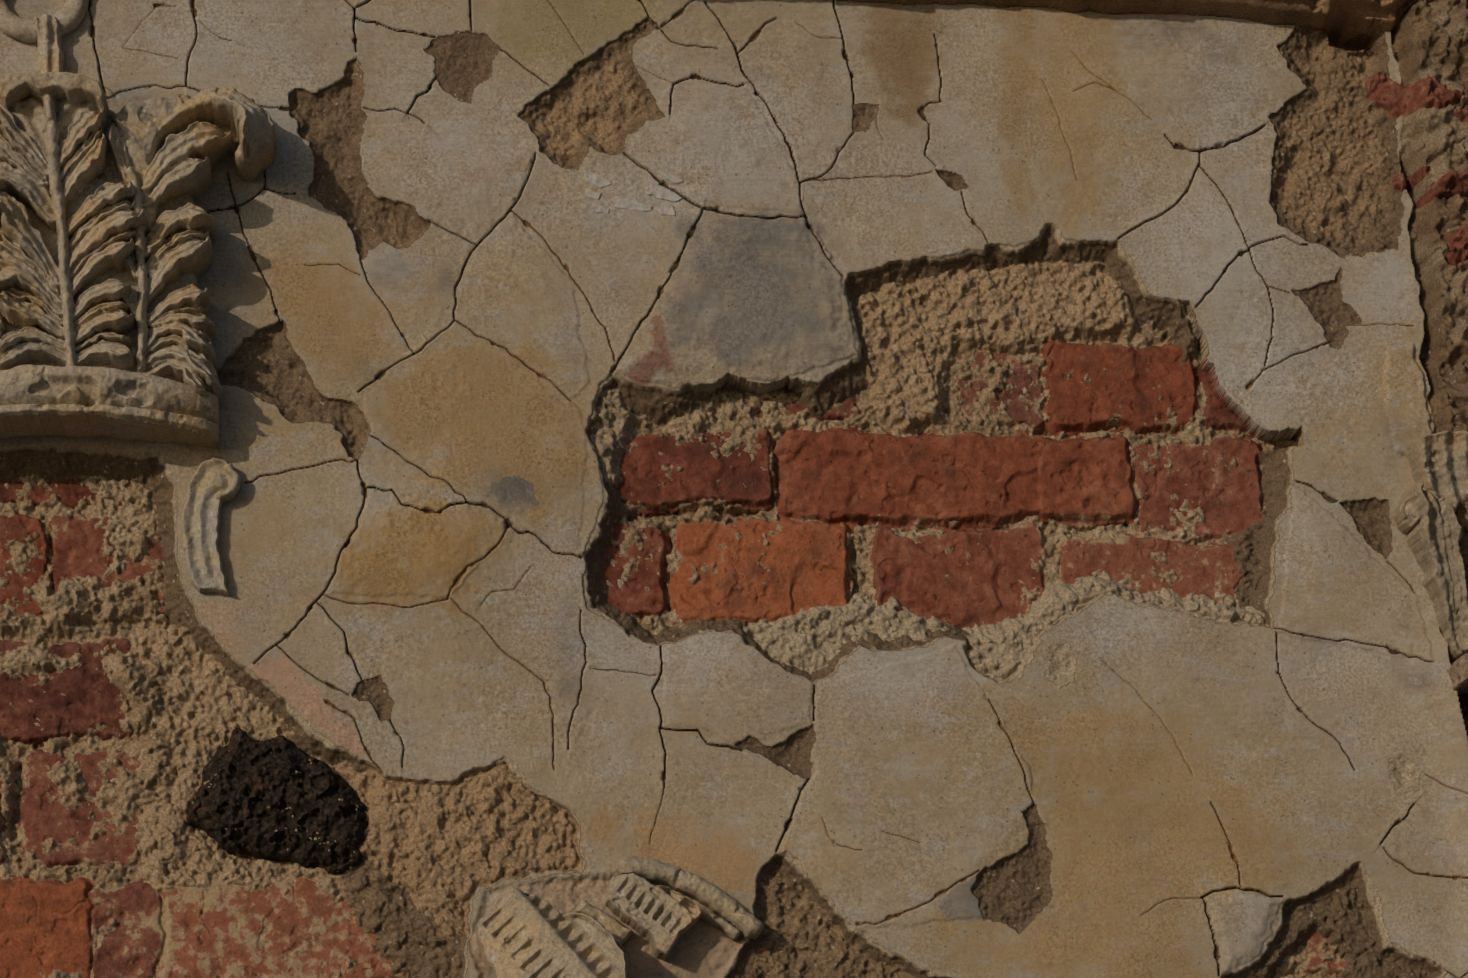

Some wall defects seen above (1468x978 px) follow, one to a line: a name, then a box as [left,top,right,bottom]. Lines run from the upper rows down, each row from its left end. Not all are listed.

crack [88,0,232,99]
spalling [288,56,431,262]
crack [304,0,942,402]
crack [1042,52,1414,390]
spalling [1269,26,1468,350]
spalling [582,223,1304,685]
spalling [0,445,586,978]
crack [245,436,742,843]
spalling [721,850,950,978]
crack [1102,659,1283,976]
spalling [1221,862,1448,978]
crack [1275,628,1433,771]